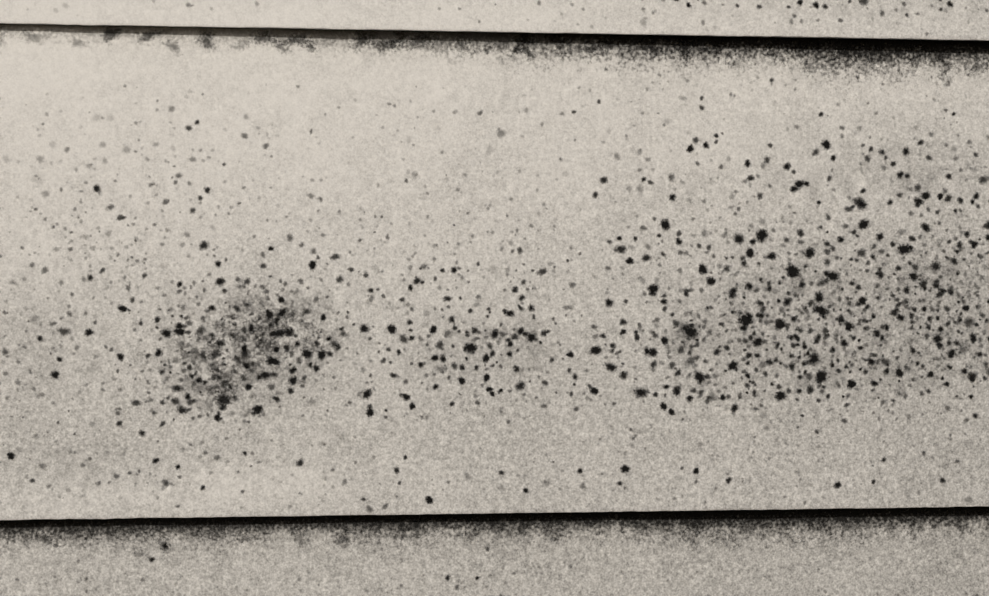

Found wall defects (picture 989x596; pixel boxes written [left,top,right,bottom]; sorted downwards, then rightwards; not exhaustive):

water stain [146,246,371,425]
water stain [363,389,387,418]
water stain [378,265,460,409]
water stain [410,269,557,396]
water stain [591,144,989,420]